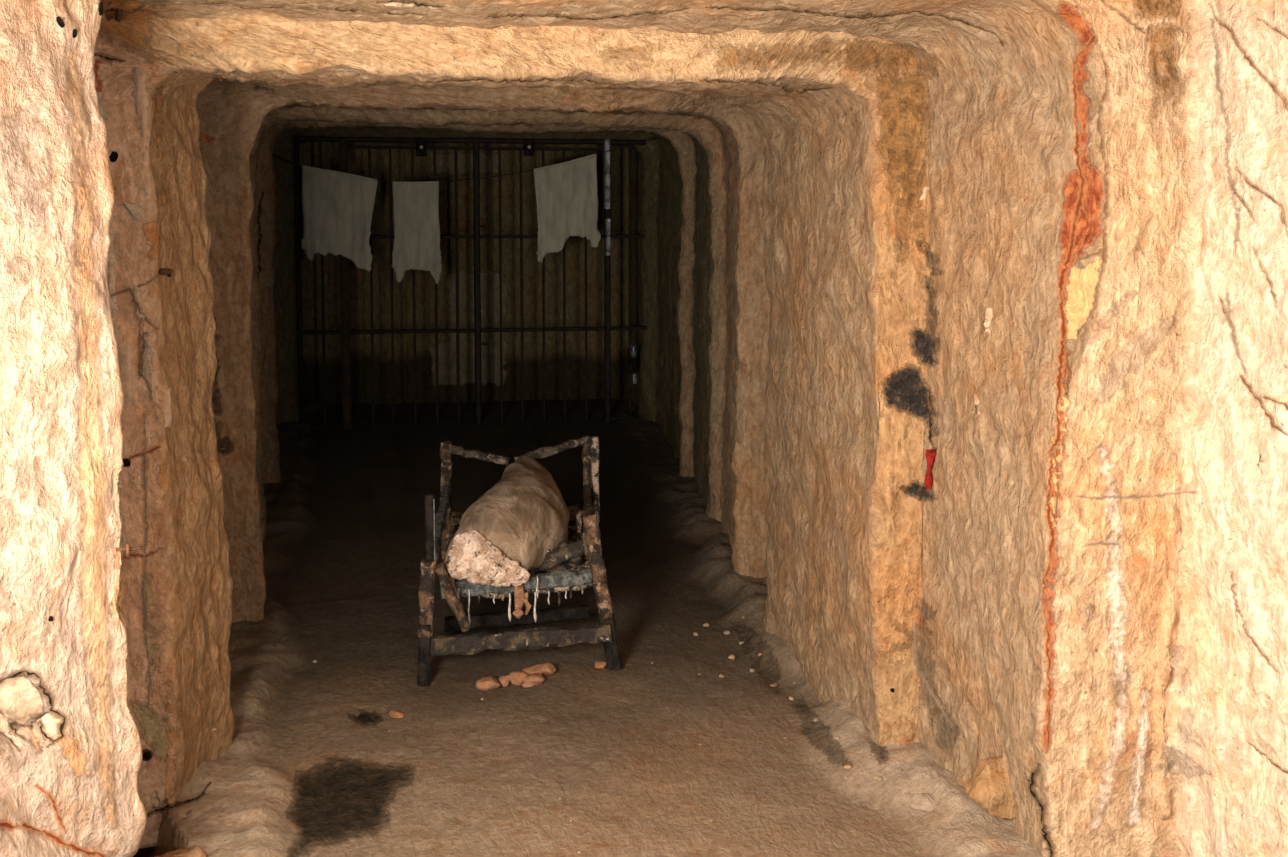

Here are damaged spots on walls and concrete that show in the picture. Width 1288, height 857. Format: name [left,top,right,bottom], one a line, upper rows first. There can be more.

rust [1057,0,1106,318]
crack [1208,3,1288,305]
crack [927,389,935,449]
crack [1029,0,1194,857]
crack [1217,291,1288,435]
rust [1040,337,1071,753]
crack [1231,573,1276,671]
crack [0,671,65,752]
crack [0,784,104,857]
leakage [286,757,414,857]
crack [914,624,960,739]
crack [1247,742,1288,773]